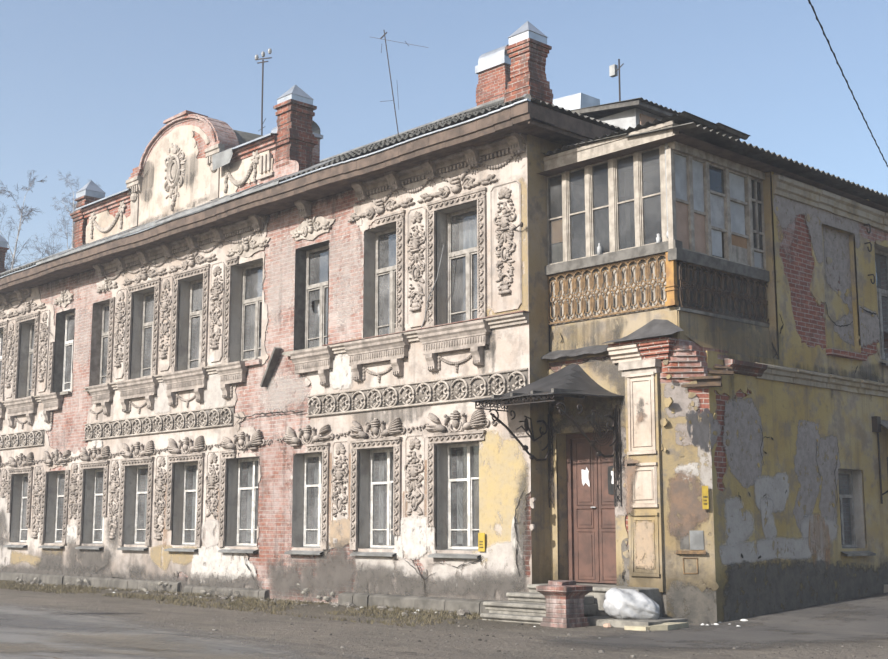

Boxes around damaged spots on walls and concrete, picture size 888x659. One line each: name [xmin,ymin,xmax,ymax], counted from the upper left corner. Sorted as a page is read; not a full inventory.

flaking render [773,194,880,358]
peeling [660,359,751,491]
water stain [0,511,8,545]
water stain [0,520,261,593]
water stain [356,474,526,601]
crack [405,556,483,595]
crack [514,487,526,577]
water stain [667,471,709,539]
water stain [662,559,888,624]
peeling [793,420,841,531]